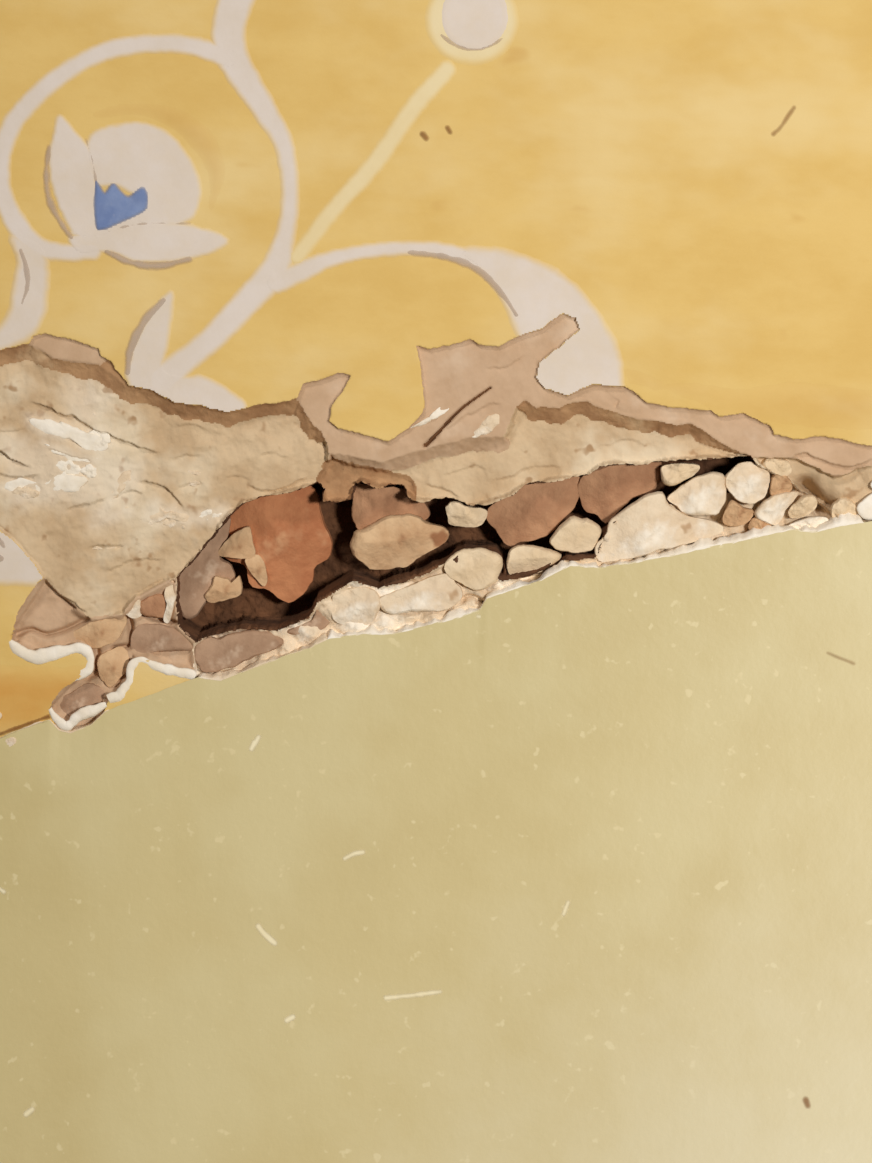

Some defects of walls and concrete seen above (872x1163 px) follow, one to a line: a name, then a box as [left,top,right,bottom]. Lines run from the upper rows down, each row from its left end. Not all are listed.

flaking render [0,314,872,733]